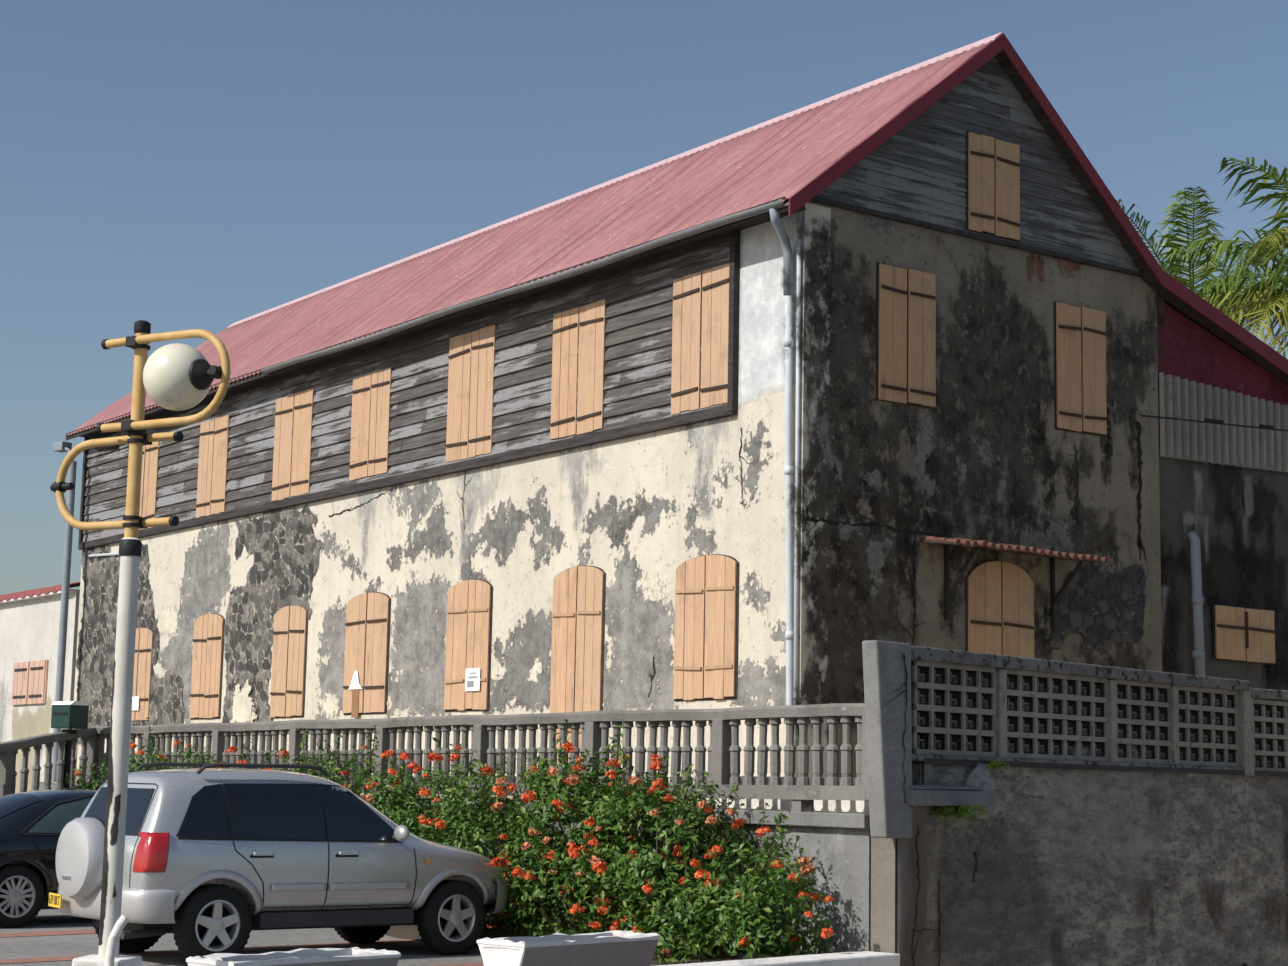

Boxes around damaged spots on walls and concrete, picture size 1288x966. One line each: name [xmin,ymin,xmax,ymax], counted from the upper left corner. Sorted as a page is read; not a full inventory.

spalling [76,545,120,747]
spalling [131,419,773,726]
peeling [731,570,800,724]
leakage [781,219,1169,744]
leakage [1034,463,1288,689]